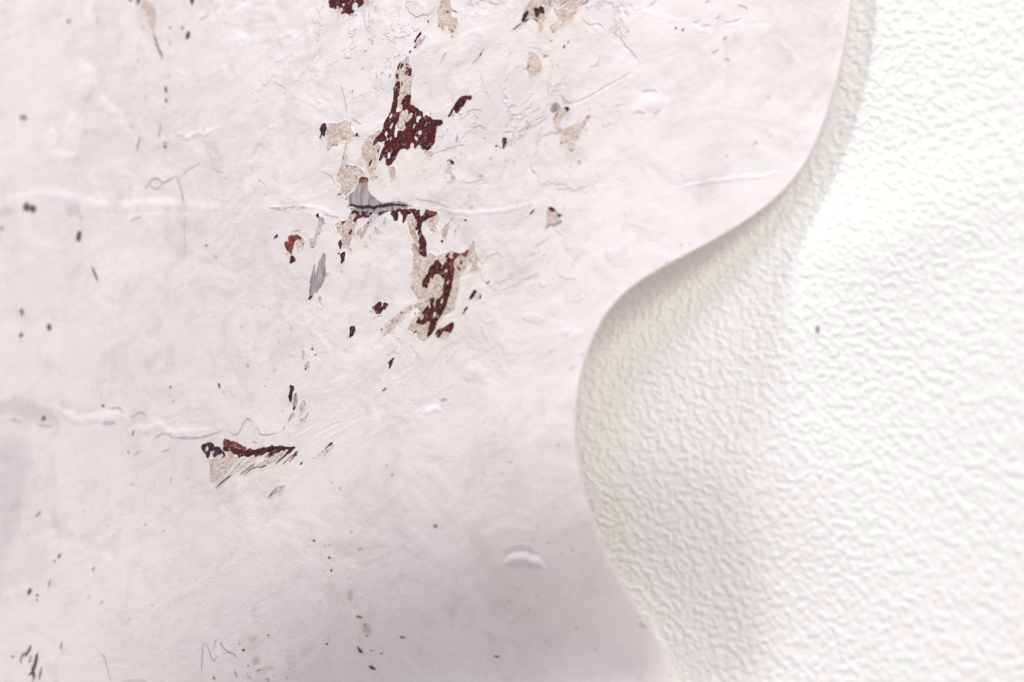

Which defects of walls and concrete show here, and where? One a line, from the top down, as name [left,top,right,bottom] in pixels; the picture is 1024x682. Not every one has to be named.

spalling [510,0,589,34]
spalling [319,31,472,198]
spalling [550,103,592,152]
crack [345,198,409,213]
spalling [274,208,489,343]
spalling [201,439,335,489]